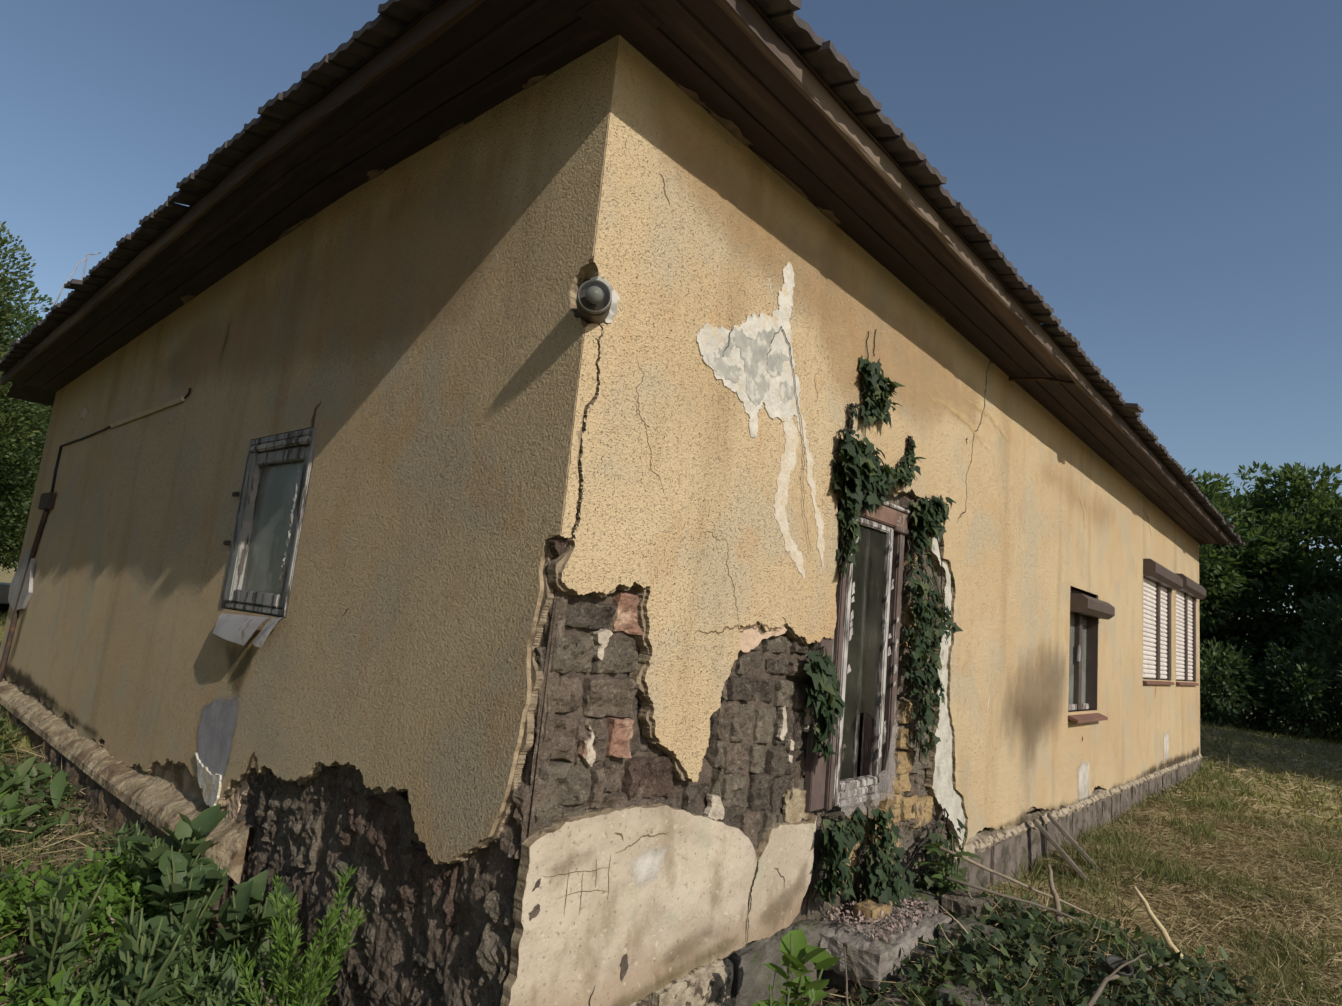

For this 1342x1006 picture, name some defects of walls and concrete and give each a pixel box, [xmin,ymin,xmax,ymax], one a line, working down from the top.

peeling [707,326,795,406]
crack [565,322,605,552]
crack [696,531,786,635]
spalling [152,493,966,1006]
crack [746,862,785,945]